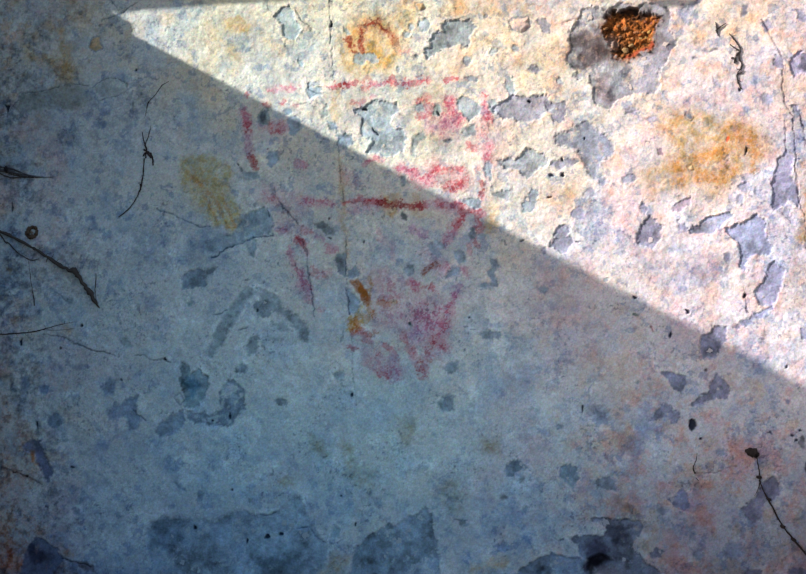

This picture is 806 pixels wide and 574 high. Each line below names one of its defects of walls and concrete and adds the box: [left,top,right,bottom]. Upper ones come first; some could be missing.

peeling [556,0,705,125]
corrosion [588,1,679,74]
corrosion [627,98,774,204]
peeling [17,535,65,574]
peeling [145,492,328,574]
peeling [348,505,442,574]
peeling [516,516,666,574]